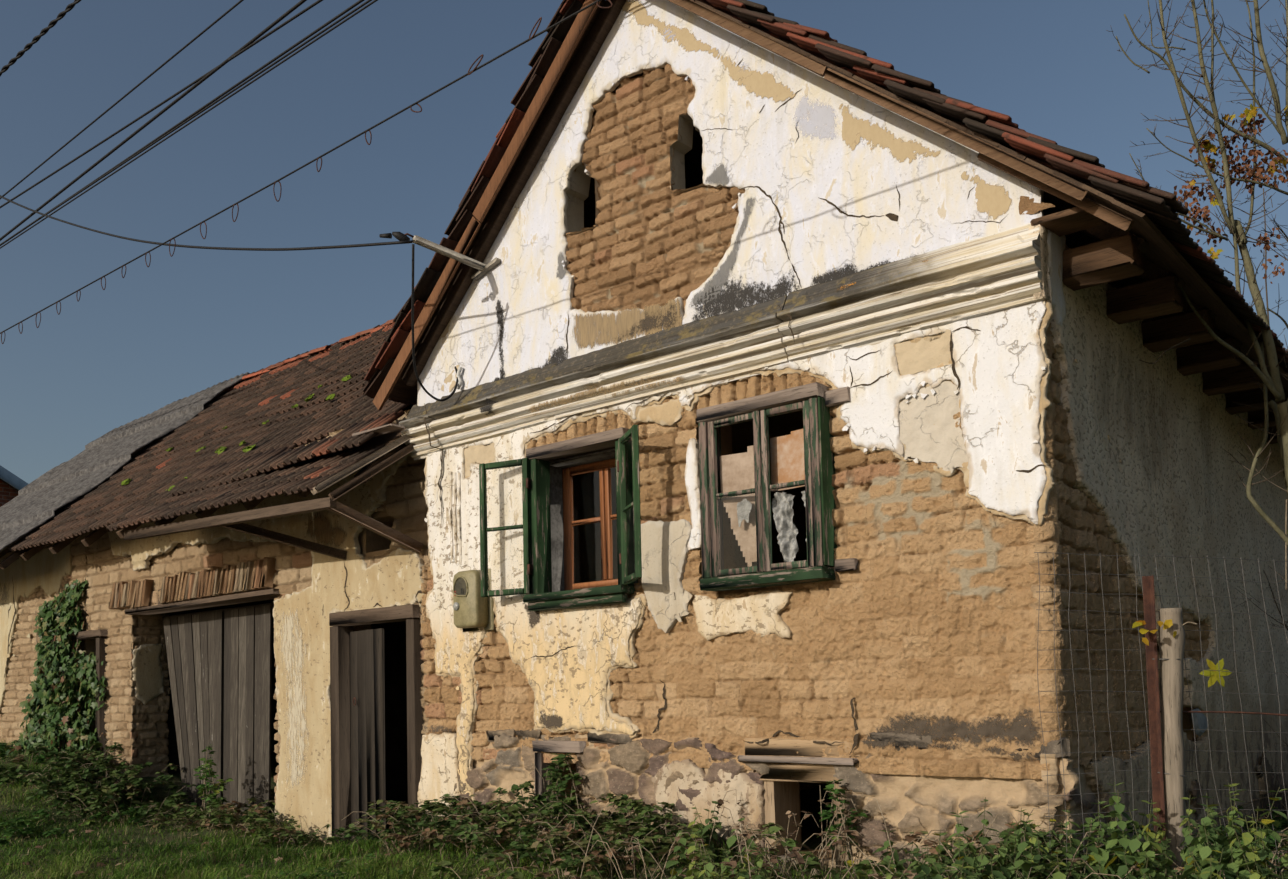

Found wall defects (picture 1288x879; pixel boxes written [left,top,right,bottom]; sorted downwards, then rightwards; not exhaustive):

damp [494,300,505,382]
flaking render [561,63,745,315]
damp [535,198,895,369]
crack [741,186,802,339]
crack [818,186,900,221]
flaking render [527,366,833,525]
flaking render [0,531,312,772]
flaking render [362,453,614,764]
flaking render [609,322,1161,779]
flaking render [1182,610,1210,662]
flaking render [273,654,281,820]
damp [863,709,1041,761]